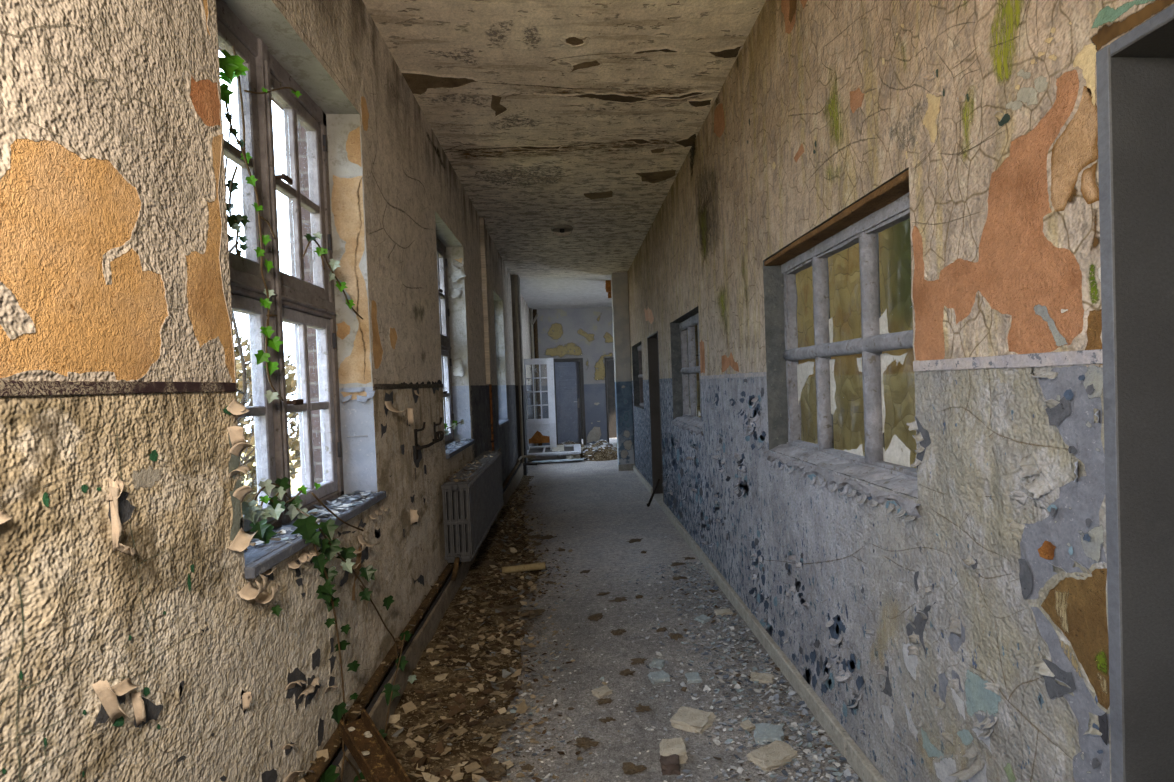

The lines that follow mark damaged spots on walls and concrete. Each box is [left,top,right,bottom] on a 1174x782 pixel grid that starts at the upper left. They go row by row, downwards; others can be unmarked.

spalling [0,131,170,382]
crack [0,0,198,244]
crack [0,394,227,782]
peeling [104,467,163,557]
leakage [126,529,156,576]
spalling [181,70,258,552]
peeling [238,506,389,604]
crack [790,0,1038,243]
crack [772,486,1072,782]
crack [942,369,1064,449]
spalling [905,27,1102,361]
peeling [1009,364,1111,782]